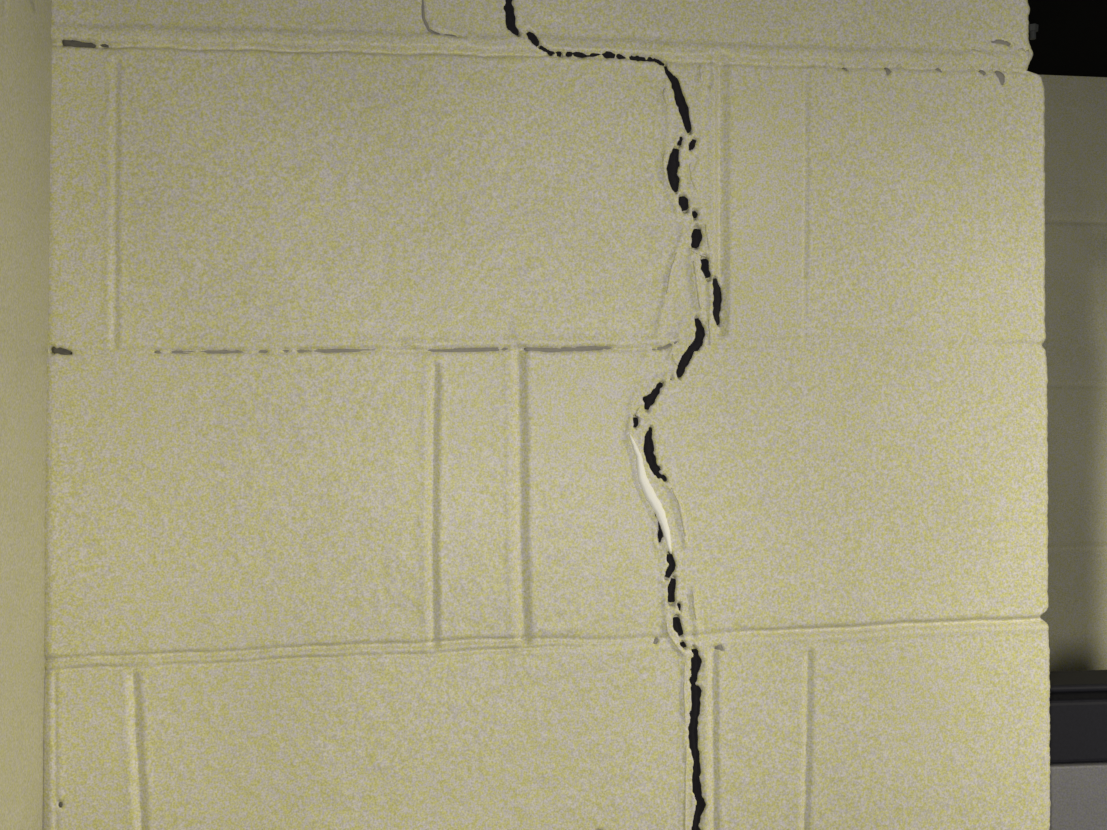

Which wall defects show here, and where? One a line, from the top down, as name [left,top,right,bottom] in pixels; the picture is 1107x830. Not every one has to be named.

crack [421,0,457,37]
crack [155,347,374,355]
crack [427,345,612,353]
crack [504,0,722,830]